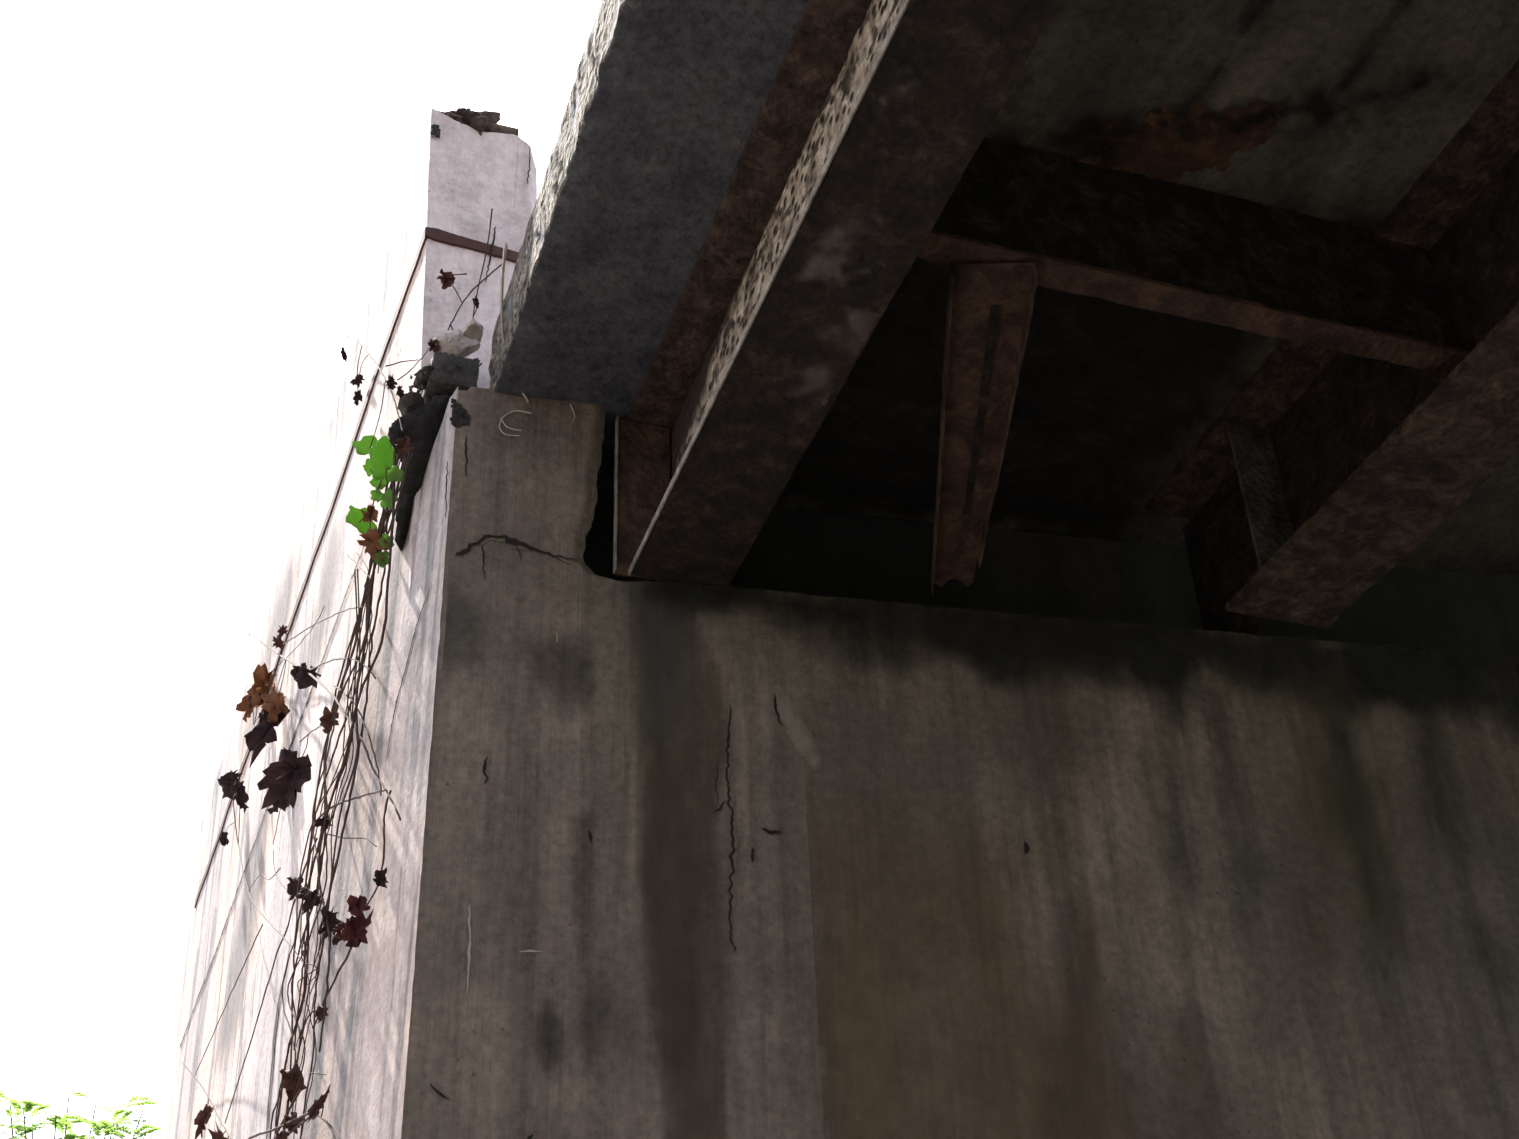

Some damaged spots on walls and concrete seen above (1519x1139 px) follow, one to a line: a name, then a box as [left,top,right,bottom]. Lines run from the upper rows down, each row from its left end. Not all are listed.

crack [445,435,579,578]
crack [386,584,432,760]
crack [714,704,739,951]